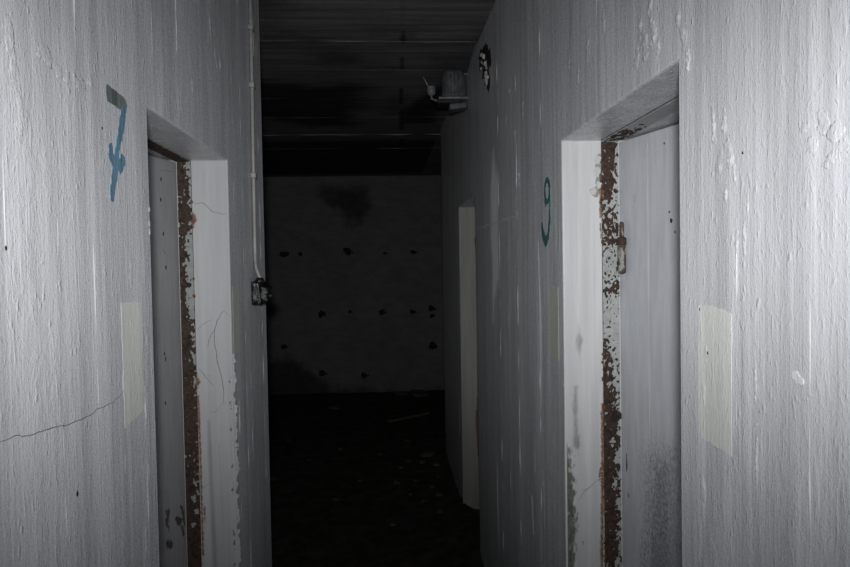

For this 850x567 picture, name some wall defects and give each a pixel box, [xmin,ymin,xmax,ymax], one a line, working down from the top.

crack [0,392,123,442]
rust [147,138,205,567]
peeling [589,153,602,205]
rust [599,124,647,567]